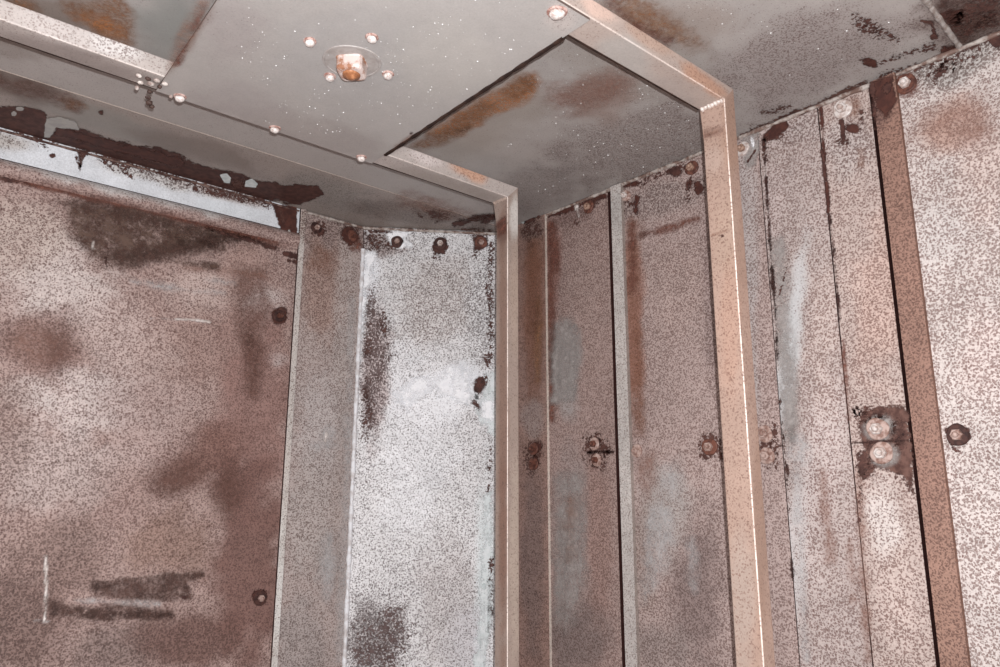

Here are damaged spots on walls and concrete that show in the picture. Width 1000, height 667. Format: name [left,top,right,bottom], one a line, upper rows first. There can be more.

corrosion [410,75,537,148]
peeling [0,106,324,233]
corrosion [310,221,396,252]
corrosion [407,199,506,259]
corrosion [698,432,723,461]
corrosion [852,404,915,529]
water stain [49,572,204,621]